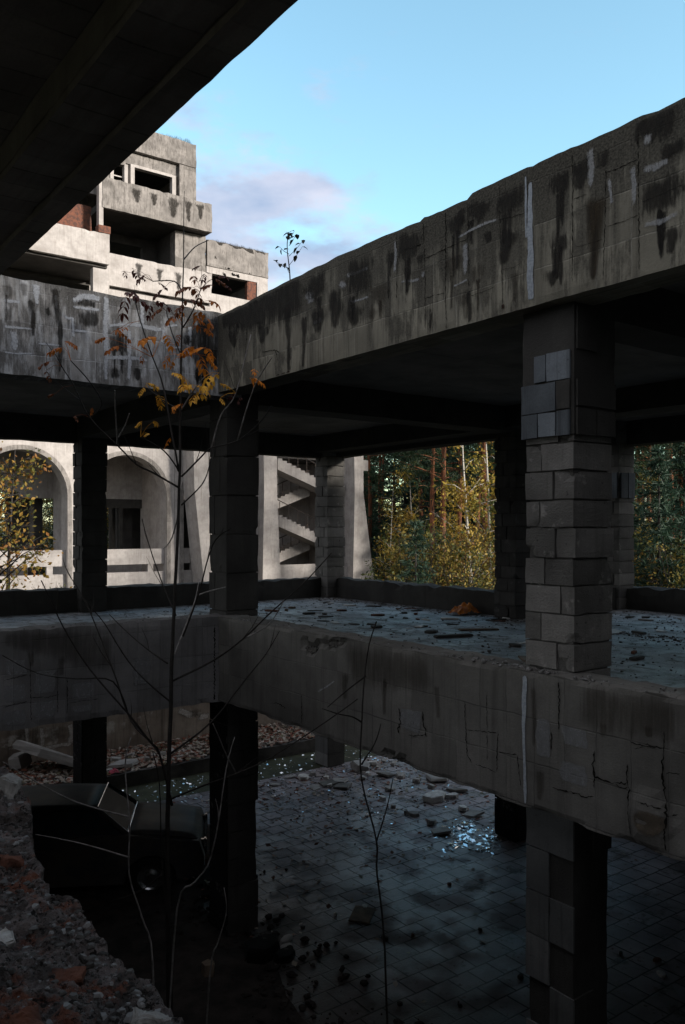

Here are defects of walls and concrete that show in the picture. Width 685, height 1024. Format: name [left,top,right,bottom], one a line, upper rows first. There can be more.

water stain [169,198,204,222]
water stain [4,257,373,387]
water stain [386,231,424,298]
water stain [449,185,523,322]
water stain [547,150,607,286]
water stain [632,107,685,257]
crack [397,709,426,737]
crack [550,683,560,749]
crack [552,735,679,850]